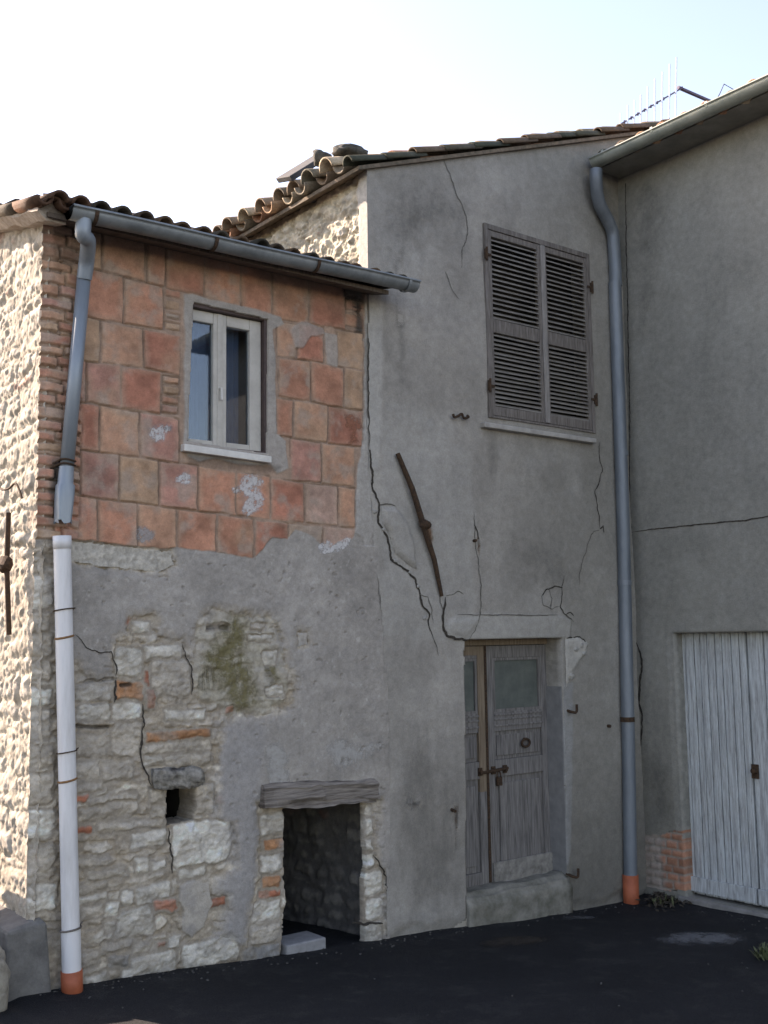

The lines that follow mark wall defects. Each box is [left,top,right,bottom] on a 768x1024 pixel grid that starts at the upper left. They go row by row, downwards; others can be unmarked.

crack [444,162,468,299]
crack [625,183,768,545]
crack [367,338,604,653]
crack [76,635,118,703]
crack [182,644,194,694]
spalling [565,637,588,687]
crack [635,642,643,743]
flaking render [26,547,62,990]
crack [140,704,151,785]
flaking render [74,608,296,984]
crack [167,828,175,873]
flaking render [645,829,693,892]